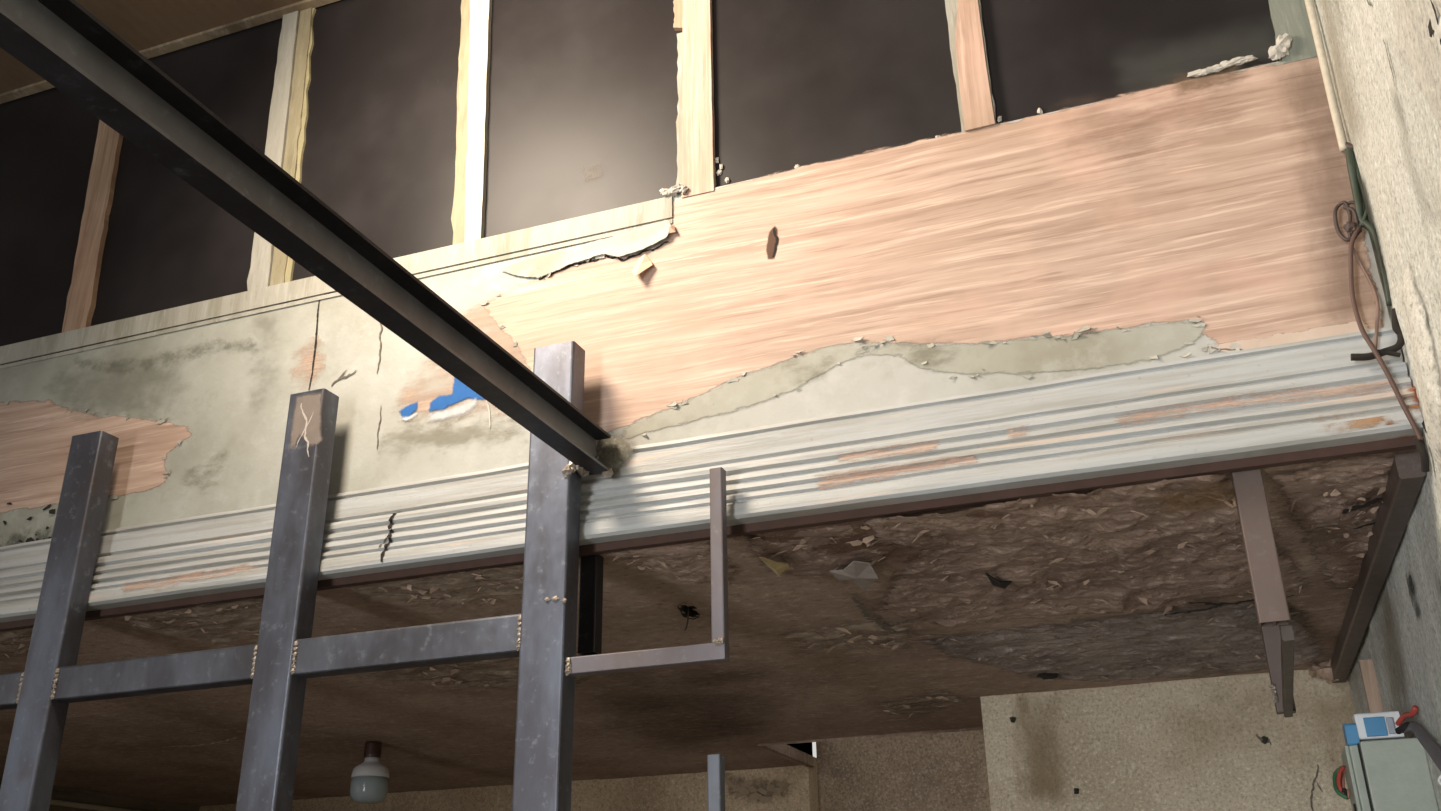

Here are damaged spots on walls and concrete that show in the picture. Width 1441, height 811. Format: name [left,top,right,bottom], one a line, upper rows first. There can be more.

peeling [464,57,1393,439]
peeling [401,386,459,413]
peeling [0,399,191,525]
water stain [8,526,52,545]
crack [379,512,398,562]